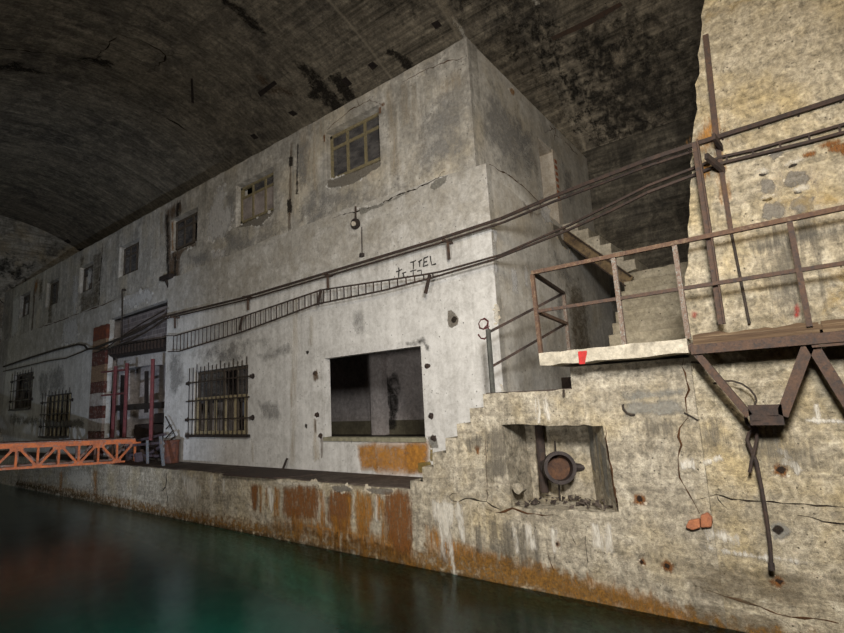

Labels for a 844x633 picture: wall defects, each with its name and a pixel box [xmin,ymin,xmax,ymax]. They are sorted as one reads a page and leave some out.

water stain [297,64,356,111]
crack [334,171,448,218]
rust [359,444,427,472]
crack [677,360,844,525]
rust [10,471,725,628]